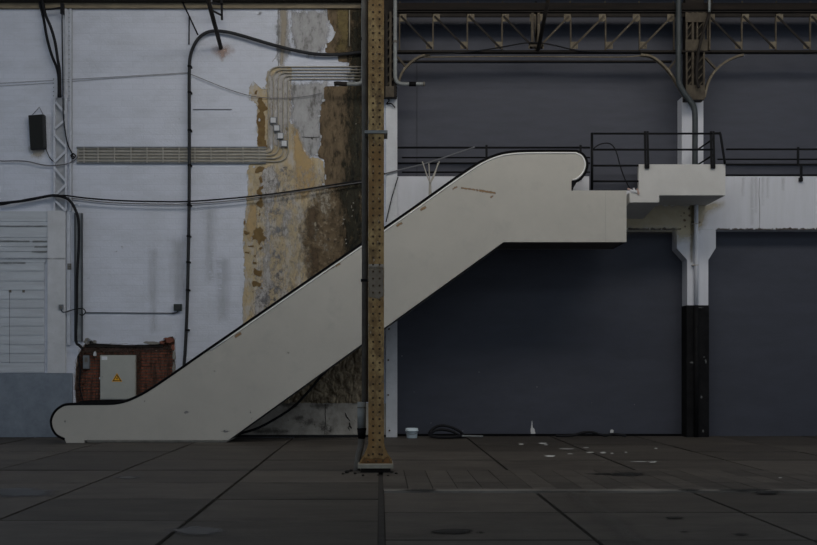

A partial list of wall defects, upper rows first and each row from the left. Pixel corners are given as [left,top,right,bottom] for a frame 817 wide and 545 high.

spalling [325,9,361,66]
peeling [242,67,362,323]